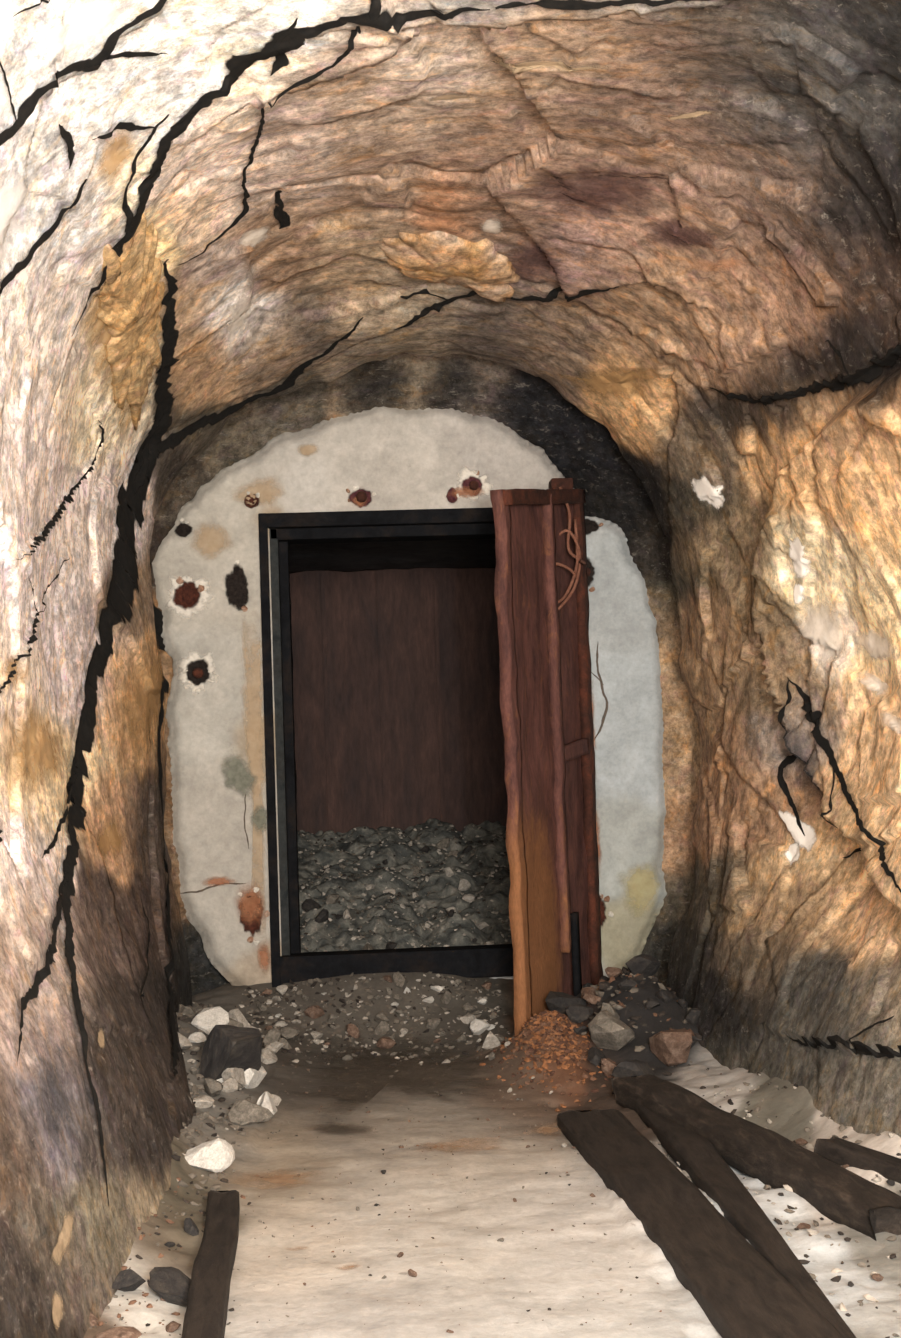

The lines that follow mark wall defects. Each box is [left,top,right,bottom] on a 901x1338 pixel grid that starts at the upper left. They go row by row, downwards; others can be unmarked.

crack [710,340,901,406]
crack [0,0,710,1206]
rust [207,877,230,885]
rust [240,640,264,920]
crack [777,678,901,893]
crack [787,1015,901,1058]